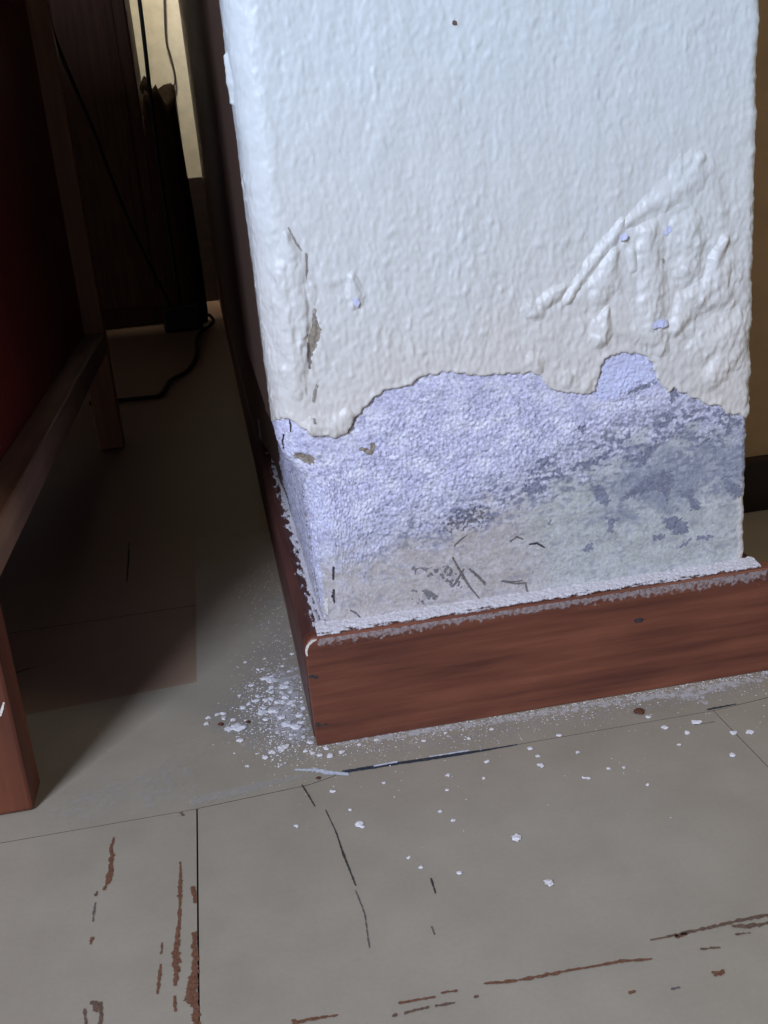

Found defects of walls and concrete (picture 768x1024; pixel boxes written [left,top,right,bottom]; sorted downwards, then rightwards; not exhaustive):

flaking render [258,353,747,621]